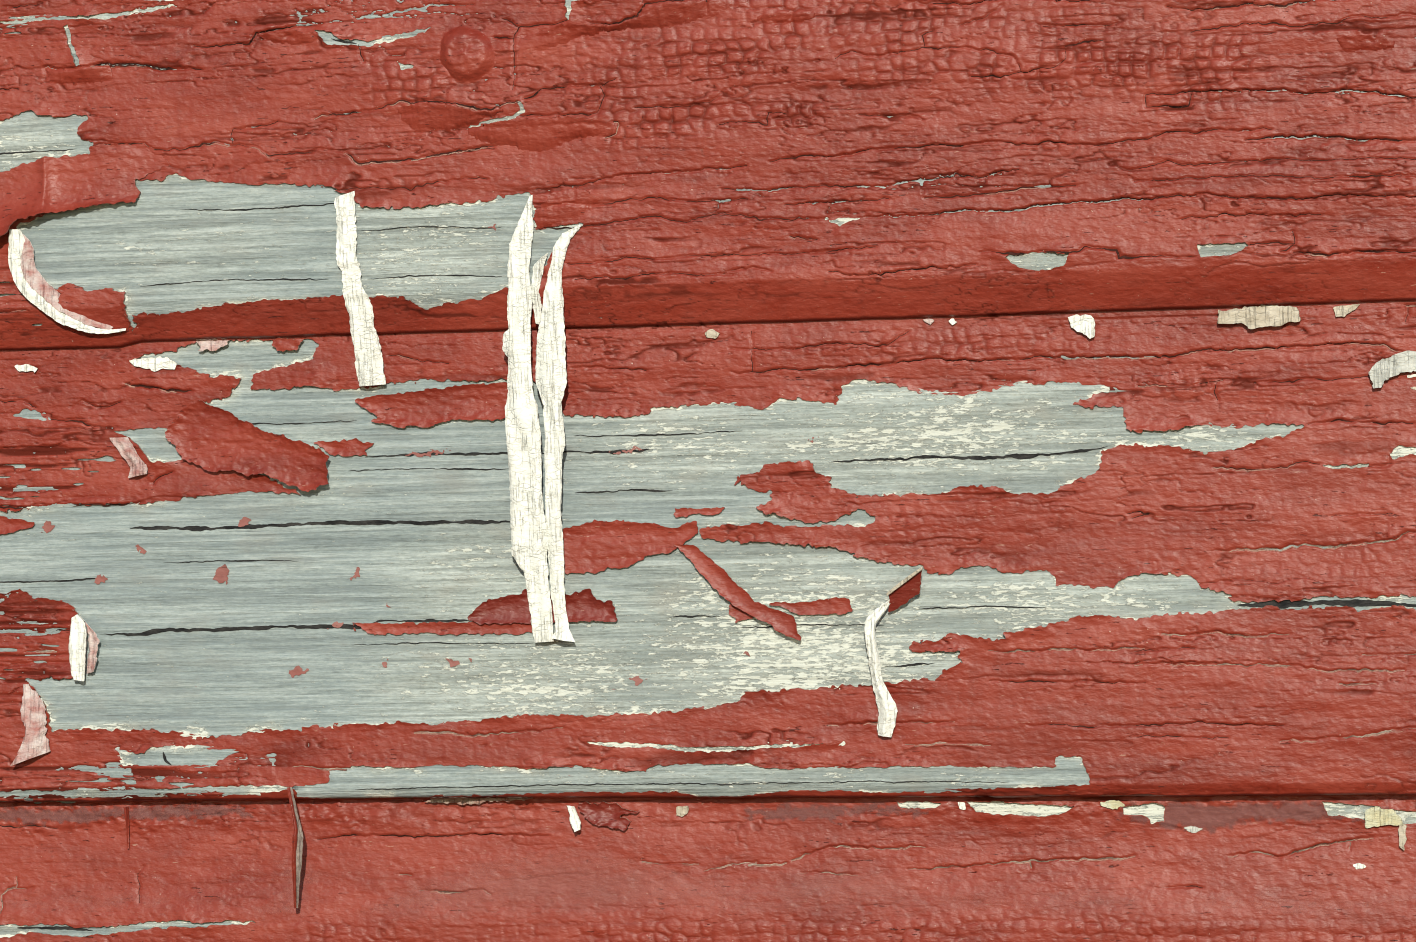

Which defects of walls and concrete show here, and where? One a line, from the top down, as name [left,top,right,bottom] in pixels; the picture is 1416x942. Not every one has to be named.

crack [835,0,1108,78]
crack [1167,0,1400,32]
crack [90,0,786,191]
peeling [469,100,525,128]
crack [535,67,1416,280]
peeling [0,110,1416,768]
crack [988,631,1416,687]
crack [1131,721,1414,743]
peeling [0,740,1090,908]
peeling [1100,800,1165,824]
peeling [1323,802,1416,850]
crack [641,845,1135,876]